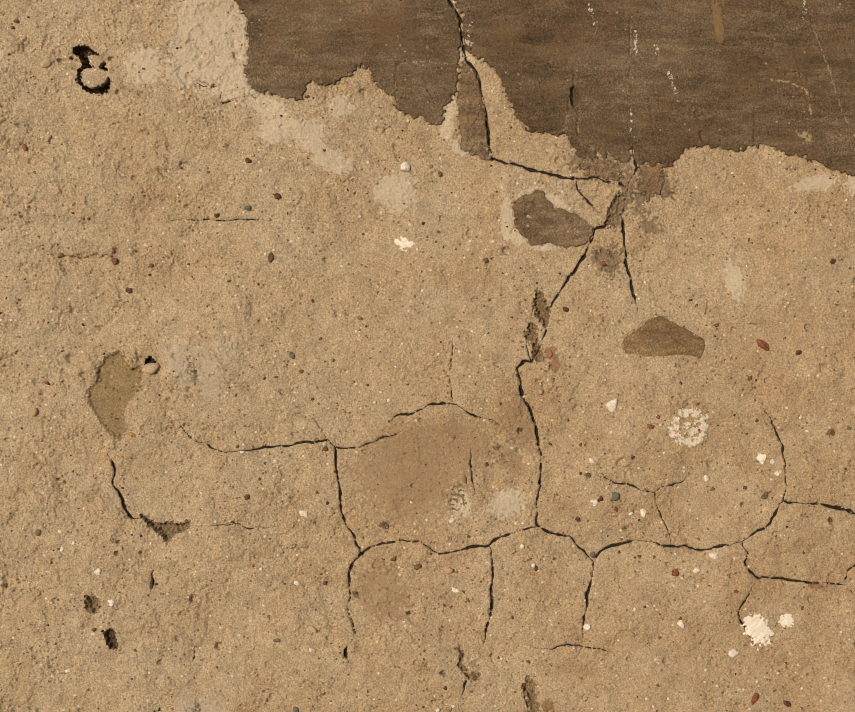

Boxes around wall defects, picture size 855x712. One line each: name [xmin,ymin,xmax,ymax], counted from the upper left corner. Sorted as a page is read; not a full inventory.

peeling [236,0,855,285]
crack [171,0,855,663]
crack [104,446,143,519]